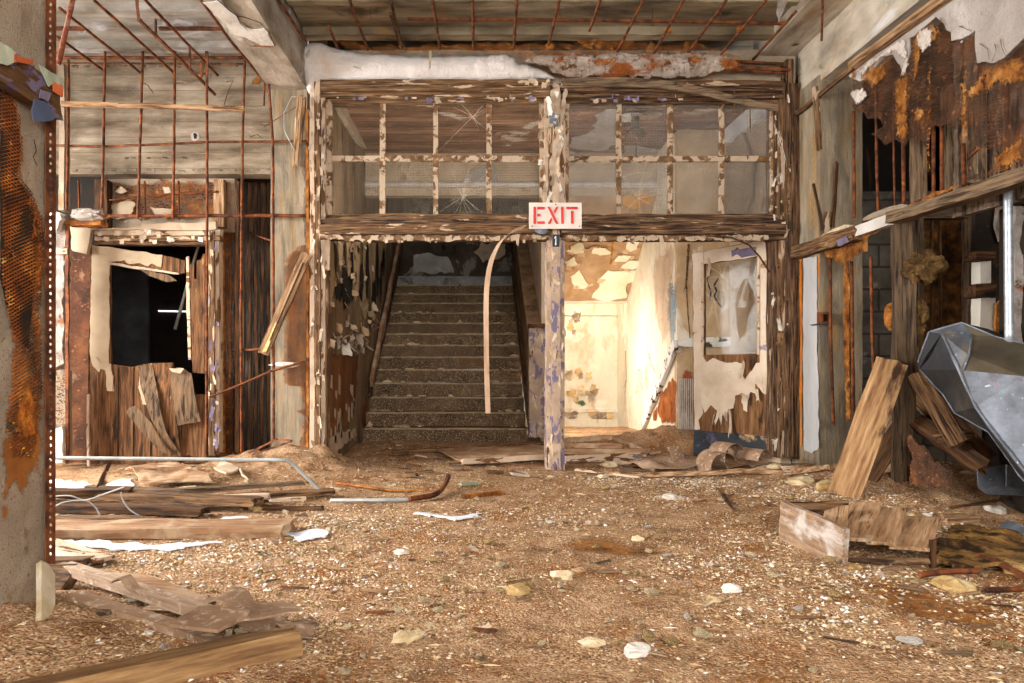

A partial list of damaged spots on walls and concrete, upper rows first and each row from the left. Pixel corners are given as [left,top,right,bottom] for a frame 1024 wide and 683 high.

corrosion [552,57,618,74]
peeling [308,83,339,202]
peeling [487,78,660,203]
peeling [771,164,791,238]
peeling [467,235,537,262]
peeling [547,235,650,302]
corrosion [2,199,44,519]
spalling [309,229,411,452]
peeling [771,292,789,345]
peeling [711,409,732,438]